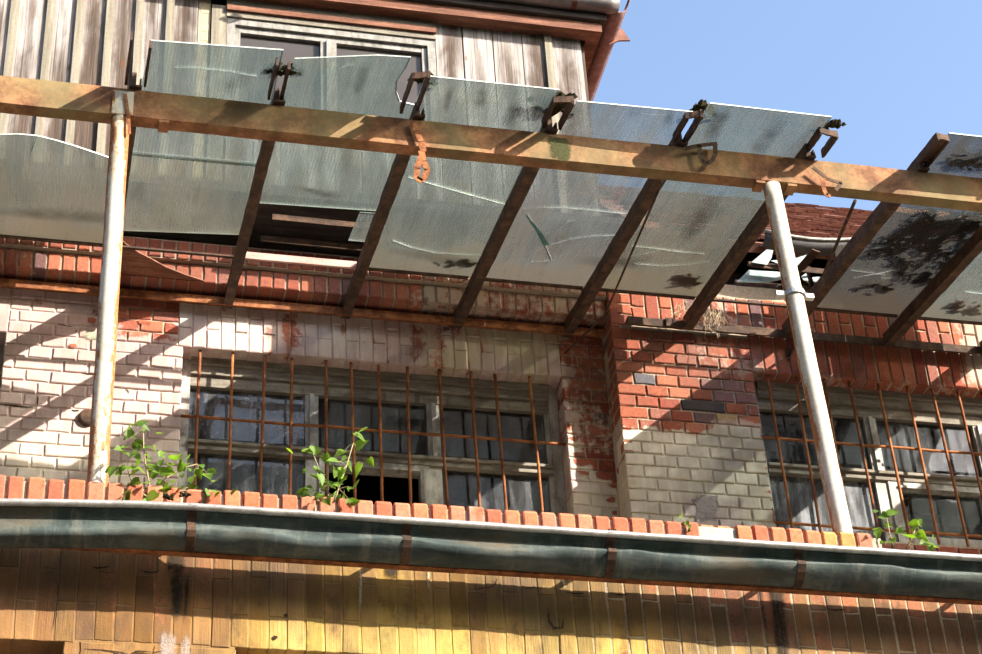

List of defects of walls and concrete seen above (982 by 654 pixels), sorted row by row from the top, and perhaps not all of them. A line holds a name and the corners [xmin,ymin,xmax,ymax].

peeling [574,459,617,515]
water stain [168,556,189,616]